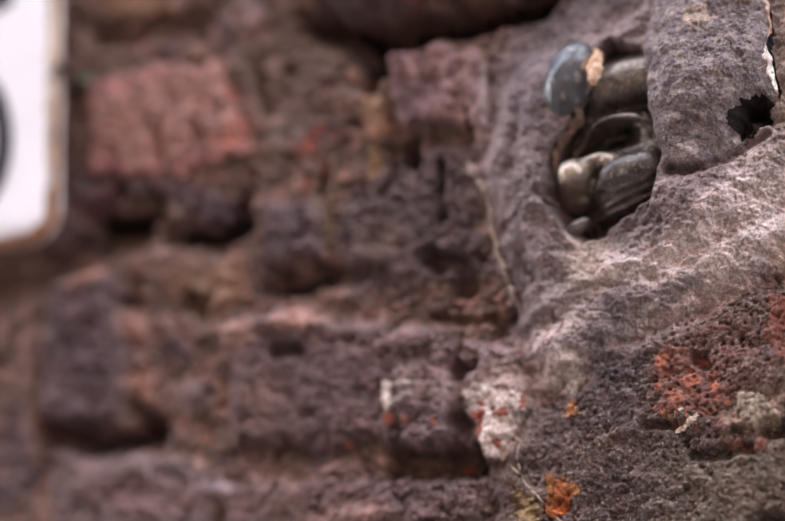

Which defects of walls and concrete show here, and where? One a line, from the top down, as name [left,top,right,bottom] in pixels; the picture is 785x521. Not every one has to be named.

peeling [581,47,604,93]
crack [751,0,782,101]
peeling [547,103,585,175]